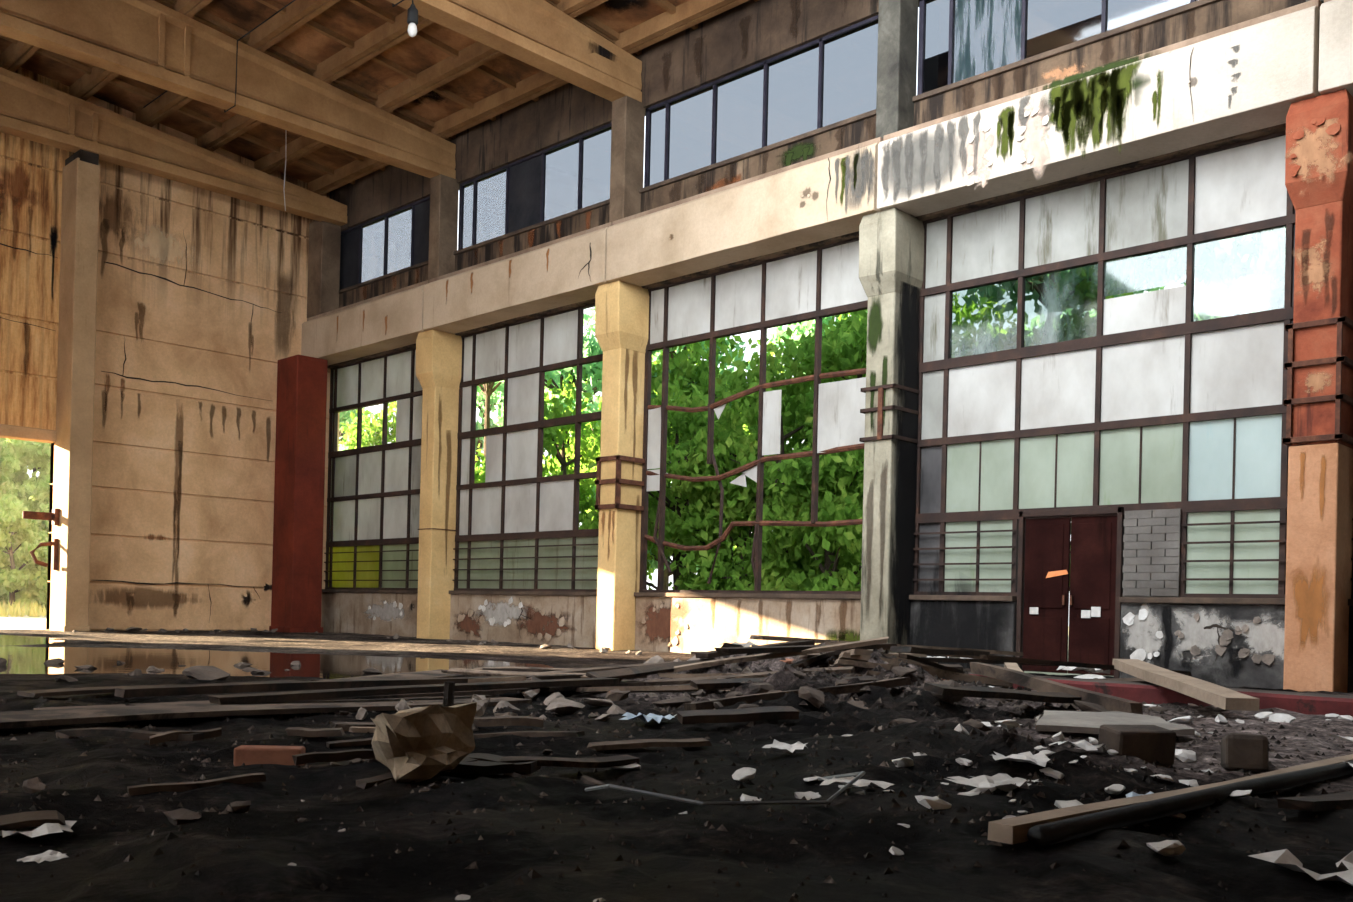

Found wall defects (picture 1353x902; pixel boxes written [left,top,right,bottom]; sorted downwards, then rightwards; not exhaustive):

leakage [835,111,980,211]
leakage [996,96,1030,158]
leakage [1050,61,1141,157]
peeling [1288,118,1346,181]
leakage [50,226,58,300]
leakage [99,200,132,273]
peeling [1296,239,1331,291]
leakage [135,304,145,338]
leakage [105,375,125,408]
spalling [454,597,572,642]
flaking render [1122,603,1285,665]